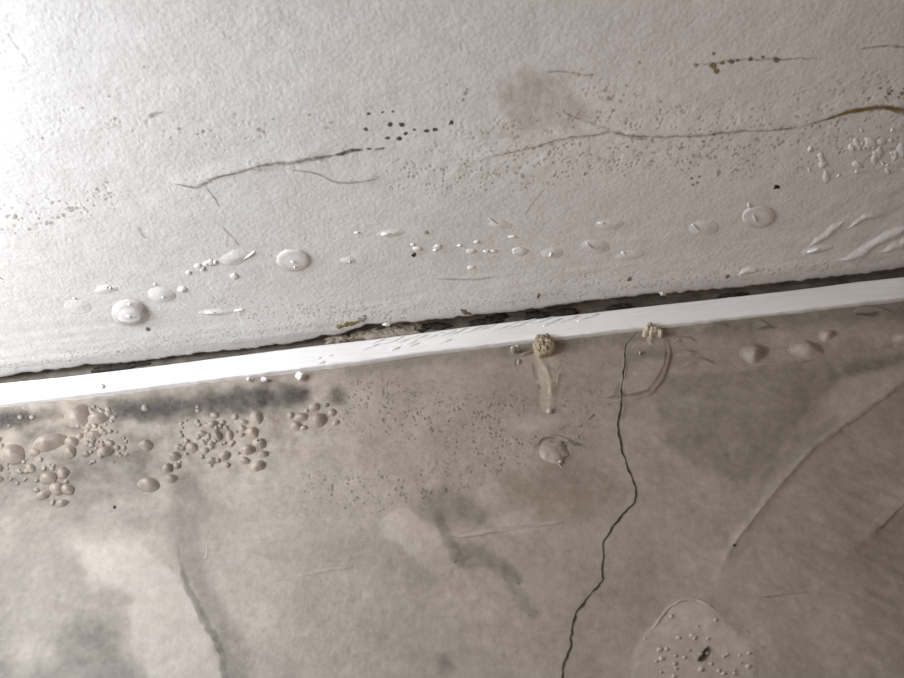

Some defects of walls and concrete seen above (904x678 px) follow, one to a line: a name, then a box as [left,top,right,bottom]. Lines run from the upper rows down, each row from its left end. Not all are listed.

crack [826,106,901,120]
crack [316,148,384,159]
damp [362,313,599,386]
damp [122,388,308,419]
damp [0,412,30,428]
crack [562,332,637,678]